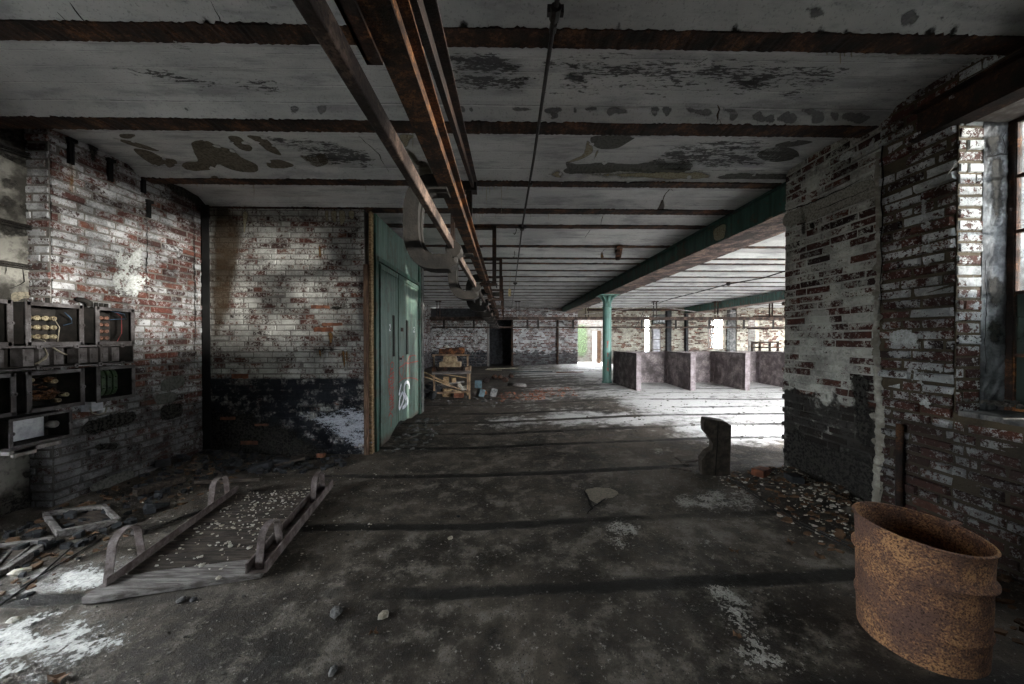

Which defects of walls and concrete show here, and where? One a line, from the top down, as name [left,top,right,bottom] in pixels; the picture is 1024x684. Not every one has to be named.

peeling [113,134,328,179]
peeling [559,135,693,183]
damp [211,208,248,332]
peeling [903,355,943,410]